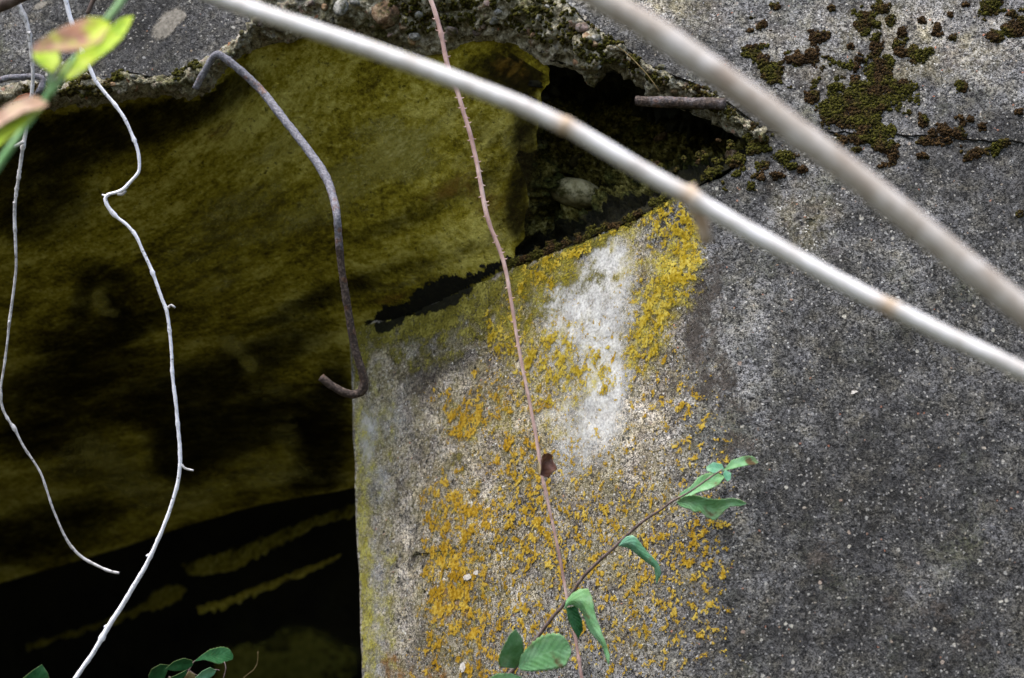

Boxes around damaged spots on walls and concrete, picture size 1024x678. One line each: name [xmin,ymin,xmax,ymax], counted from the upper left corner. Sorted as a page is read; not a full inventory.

water stain [0,74,252,239]
spalling [0,18,369,399]
spalling [255,0,767,188]
spalling [506,123,672,266]
water stain [0,265,373,492]
water stain [0,499,115,564]